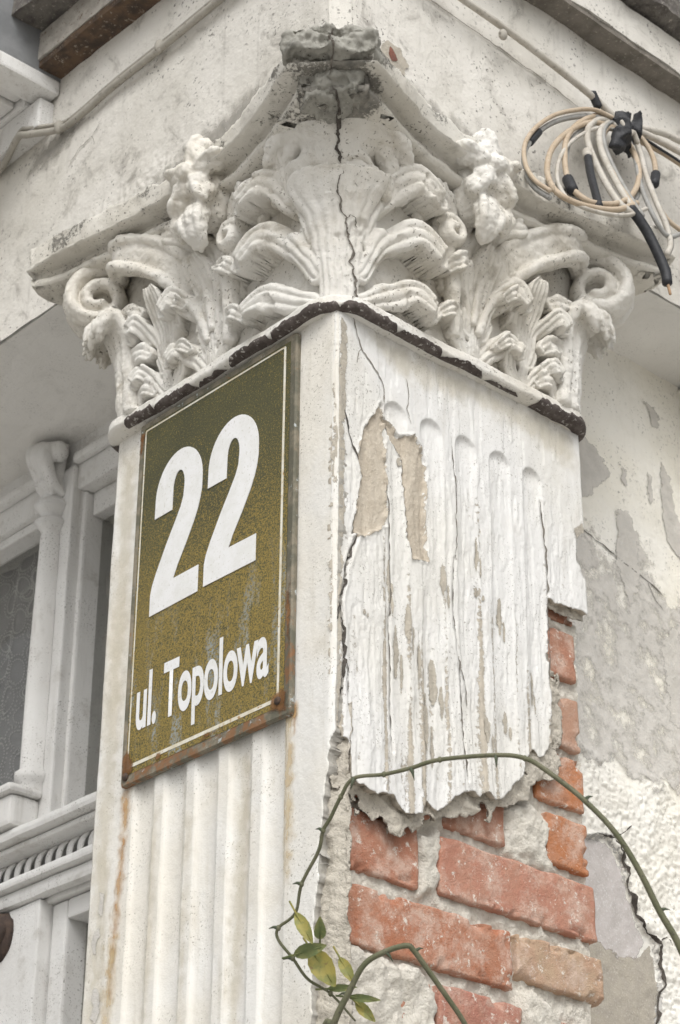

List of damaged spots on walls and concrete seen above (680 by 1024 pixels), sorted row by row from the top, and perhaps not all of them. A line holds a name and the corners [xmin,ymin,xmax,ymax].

crack [328,30,410,419]
spalling [124,300,518,721]
crack [337,537,357,694]
crack [343,394,359,459]
crack [385,483,393,675]
peeling [386,560,444,768]
spalling [329,653,563,837]
peeling [528,397,627,497]
peeling [548,508,680,795]
peeling [647,462,680,558]
corrosion [115,797,128,912]
crack [595,826,673,1024]